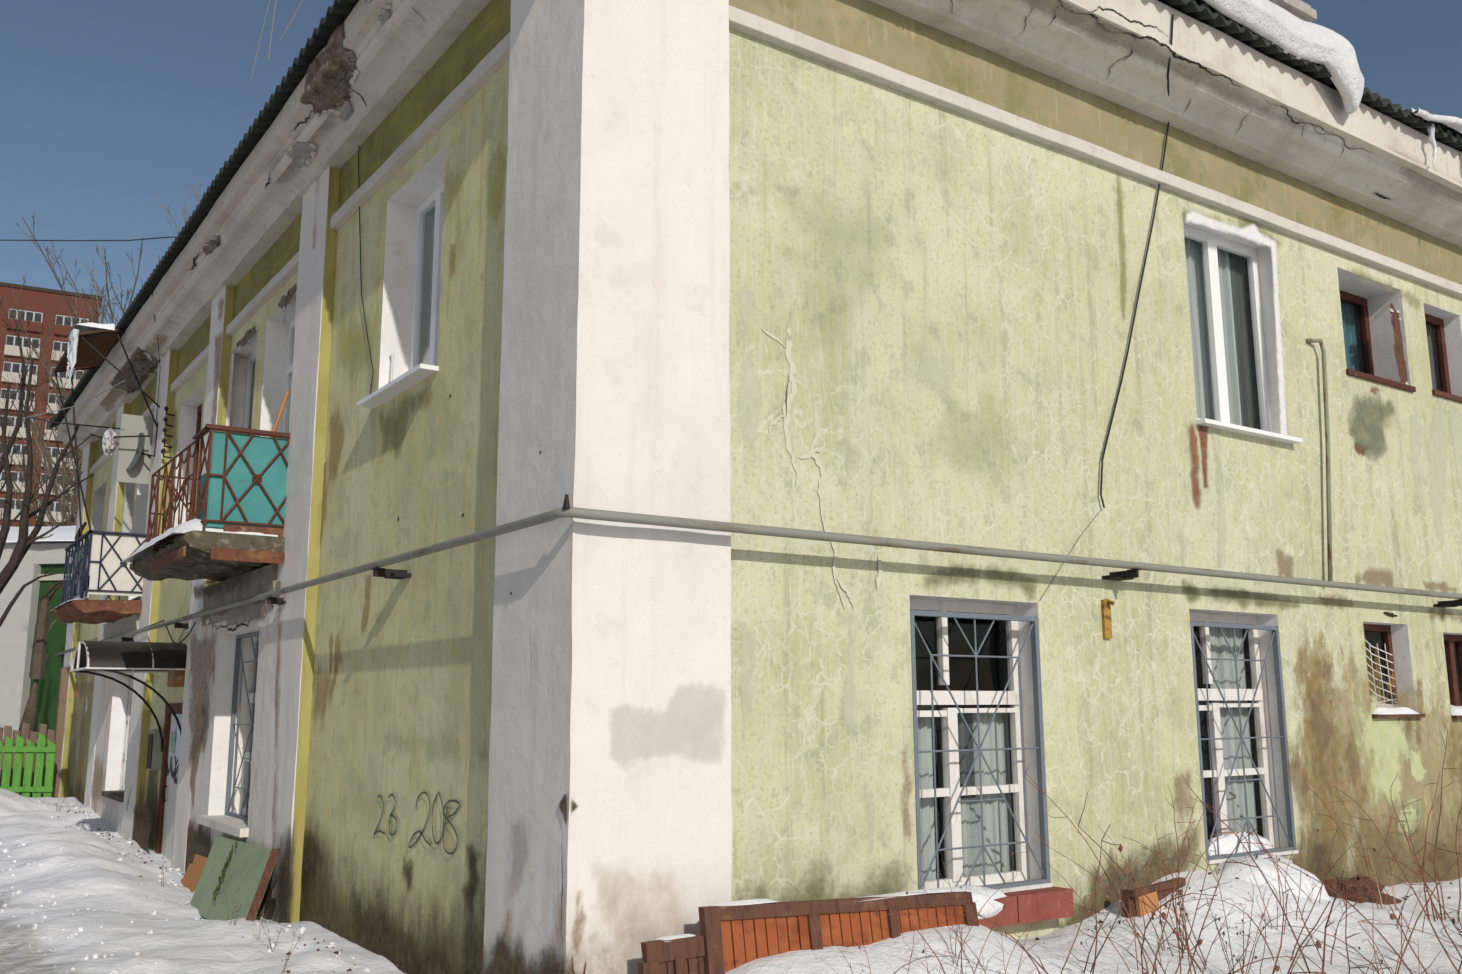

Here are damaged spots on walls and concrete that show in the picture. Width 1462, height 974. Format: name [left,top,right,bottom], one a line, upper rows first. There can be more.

spalling [300,22,360,122]
crack [1022,0,1372,154]
spalling [285,142,317,168]
spalling [200,236,220,256]
spalling [109,347,165,394]
damp [1350,388,1394,456]
rust [1191,425,1208,506]
peeling [189,581,280,767]
damp [1396,693,1411,742]
damp [1309,701,1462,886]
damp [257,834,484,974]